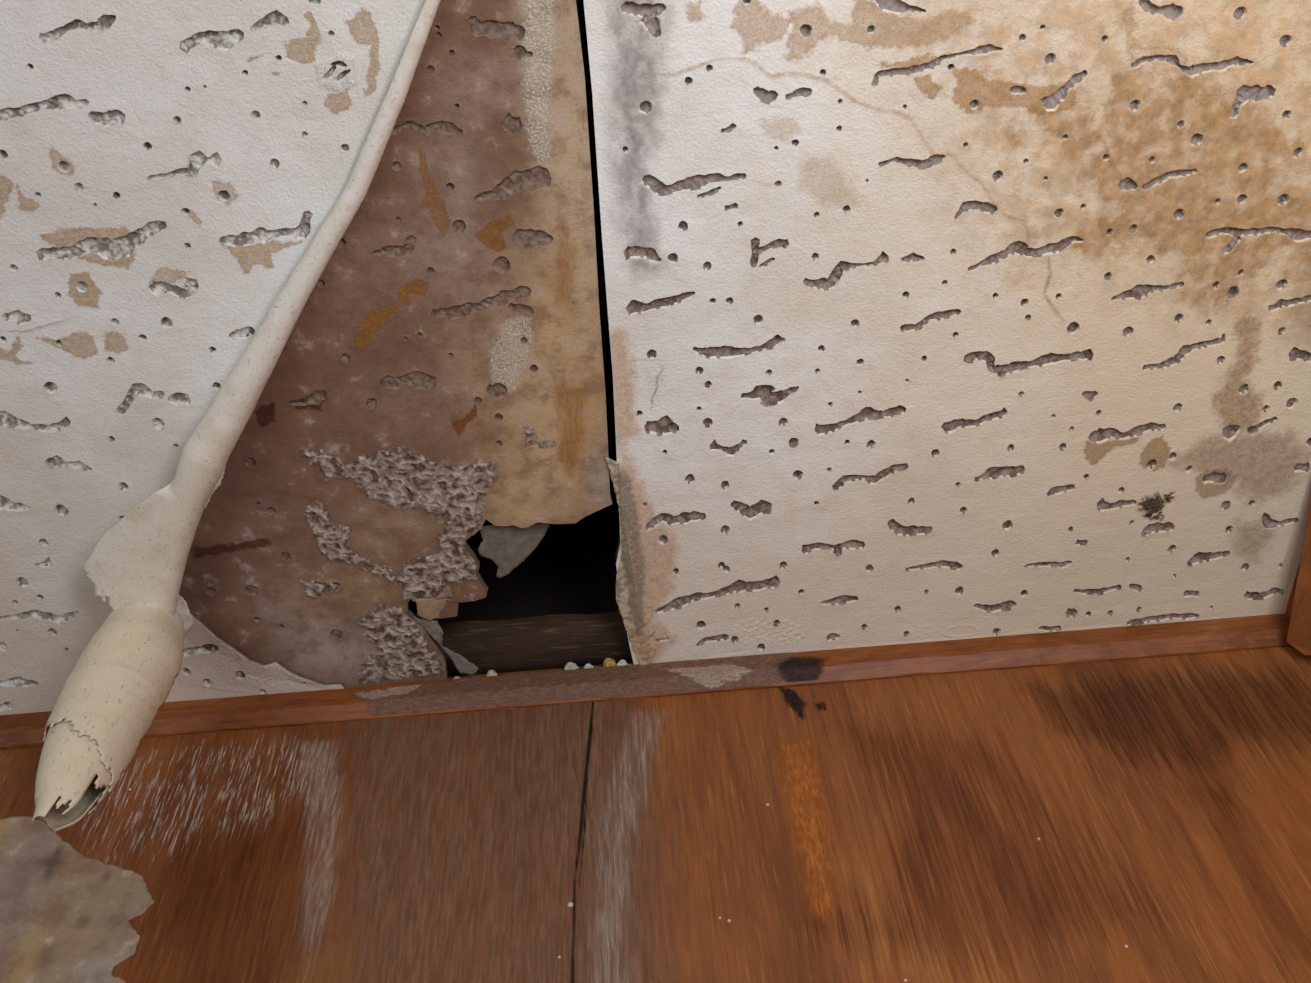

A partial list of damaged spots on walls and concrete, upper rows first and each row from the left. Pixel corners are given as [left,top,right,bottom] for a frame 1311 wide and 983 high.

water stain [731,0,1311,304]
peeling [0,0,612,983]
water stain [1137,491,1176,521]
water stain [1084,317,1298,498]
water stain [779,657,826,719]
water stain [82,737,338,983]
crack [571,702,593,983]